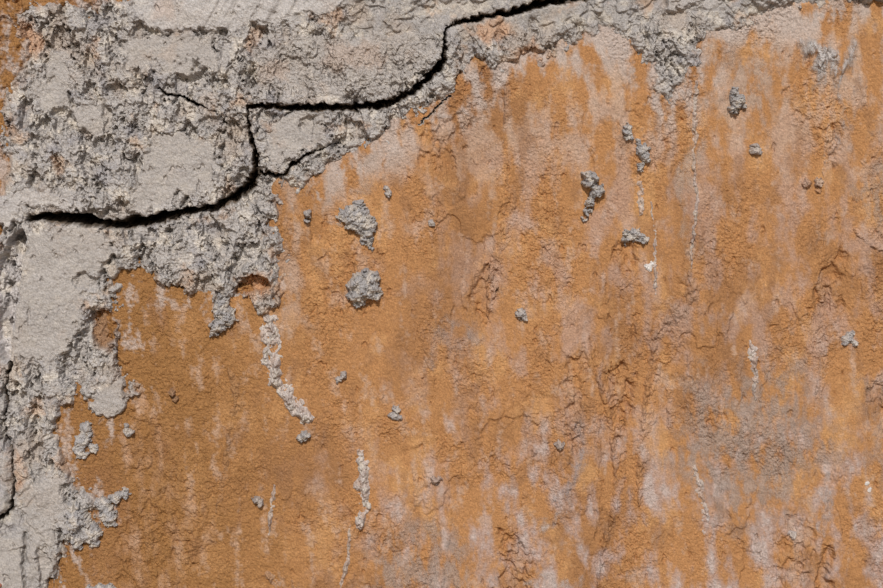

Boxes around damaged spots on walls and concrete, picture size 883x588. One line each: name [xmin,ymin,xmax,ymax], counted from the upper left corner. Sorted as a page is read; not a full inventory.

crack [24,0,592,232]
crack [0,360,17,521]